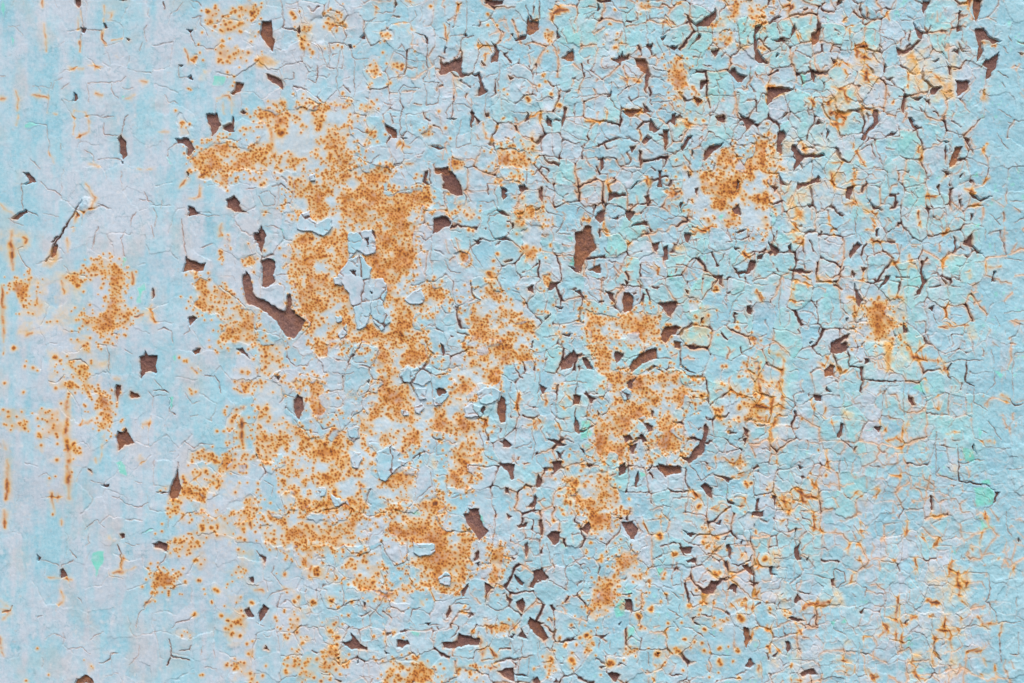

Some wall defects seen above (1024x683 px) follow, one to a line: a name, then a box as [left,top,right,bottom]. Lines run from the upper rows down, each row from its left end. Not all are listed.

peeling [439,45,499,96]
crack [859,0,981,141]
peeling [975,29,999,79]
rust [0,160,161,533]
crack [7,75,294,274]
peeling [243,257,305,338]
rust [105,0,914,683]
peeling [565,205,634,273]
crack [478,0,810,467]
peeling [614,302,681,401]
rust [578,9,993,414]
crack [777,114,1024,537]